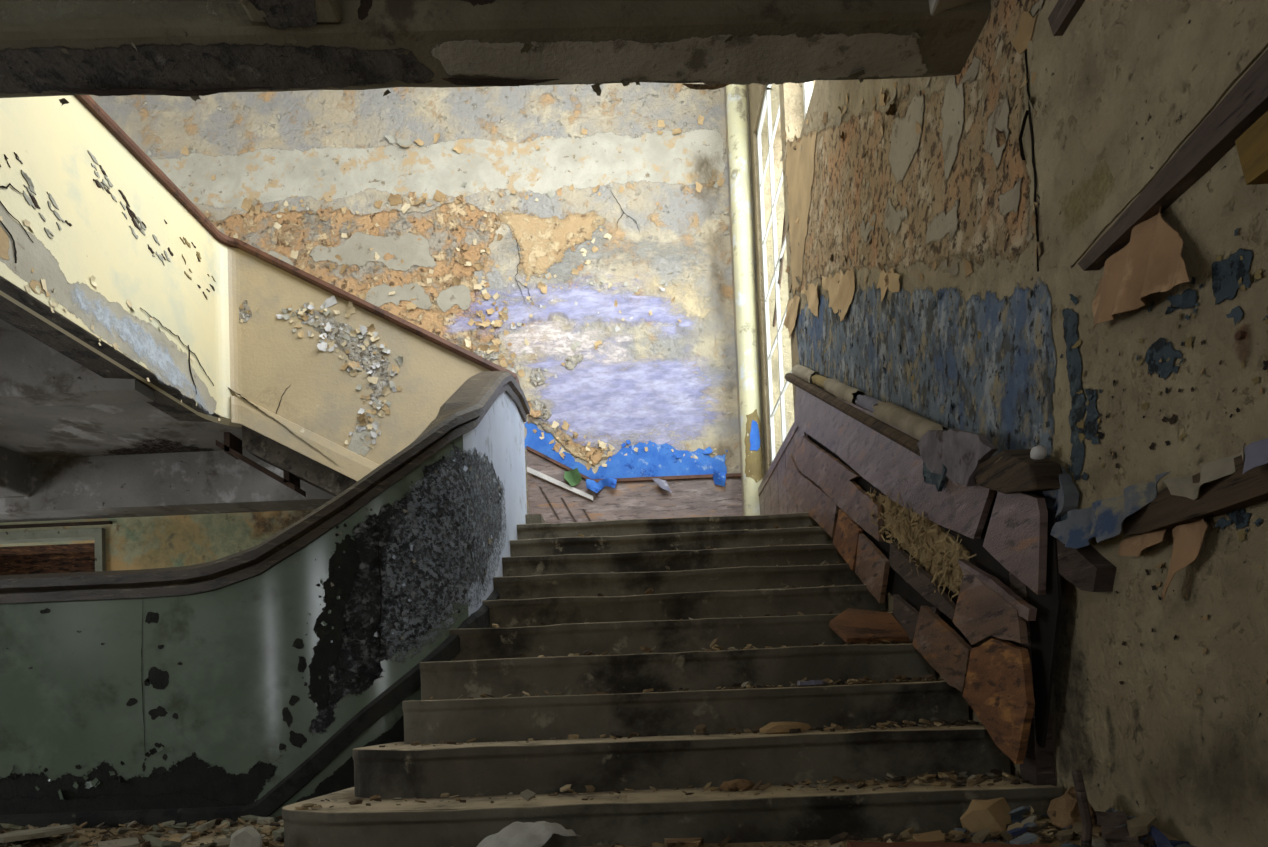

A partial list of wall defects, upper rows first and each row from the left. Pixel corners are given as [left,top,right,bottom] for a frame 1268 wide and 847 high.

crack [0,183,34,263]
flaking render [0,0,1124,522]
peeling [1148,228,1263,329]
peeling [1136,337,1204,450]
peeling [145,612,159,624]
peeling [144,662,182,690]
peeling [292,638,307,672]
peeling [148,706,179,720]
peeling [279,695,307,750]
water stain [363,715,404,747]
water stain [0,743,287,815]
water stain [296,756,354,803]